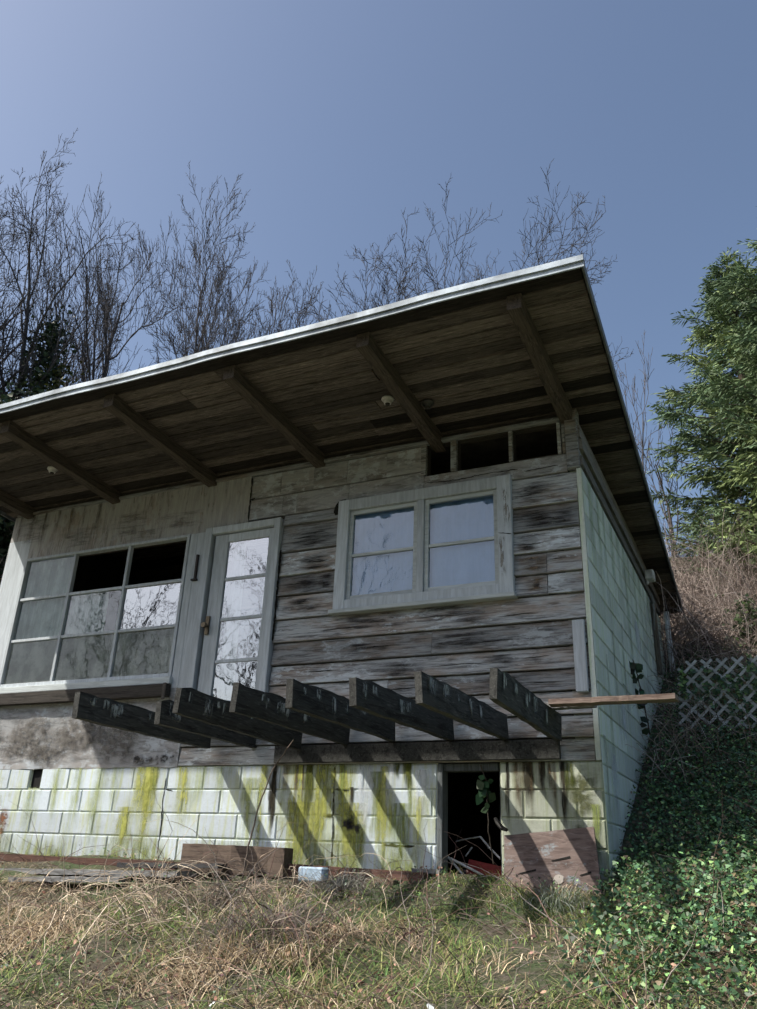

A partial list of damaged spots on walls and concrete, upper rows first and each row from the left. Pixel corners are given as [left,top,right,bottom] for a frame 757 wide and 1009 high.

damp [291,531,332,612]
damp [428,605,493,648]
damp [116,807,128,847]
damp [133,755,188,835]
damp [244,764,365,868]
damp [377,763,422,871]